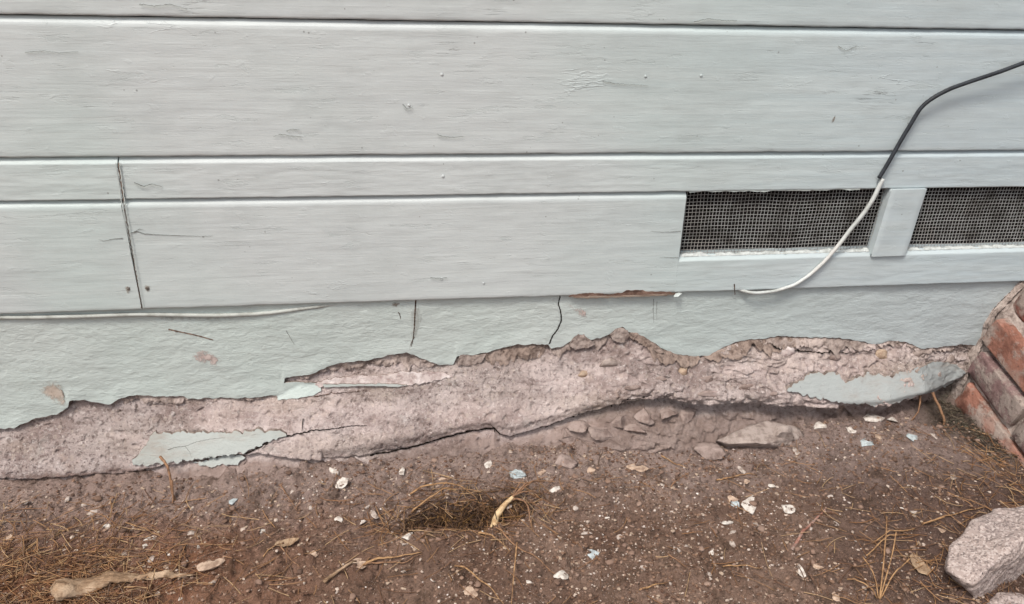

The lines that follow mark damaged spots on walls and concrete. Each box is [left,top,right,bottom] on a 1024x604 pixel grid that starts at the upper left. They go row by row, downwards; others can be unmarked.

crack [398,300,416,350]
crack [547,296,562,344]
crack [245,390,367,455]
spalling [0,327,972,481]
crack [370,391,689,456]